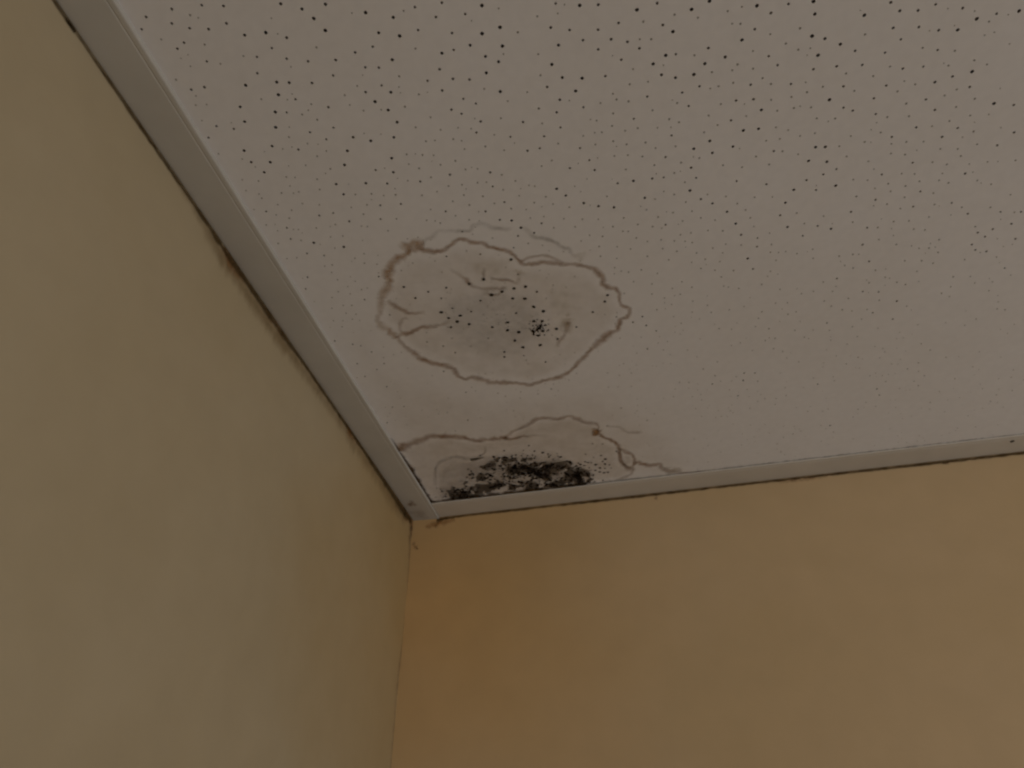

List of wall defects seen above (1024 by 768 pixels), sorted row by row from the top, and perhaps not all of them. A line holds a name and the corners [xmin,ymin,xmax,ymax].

damp [414,285,559,356]
damp [398,430,620,503]